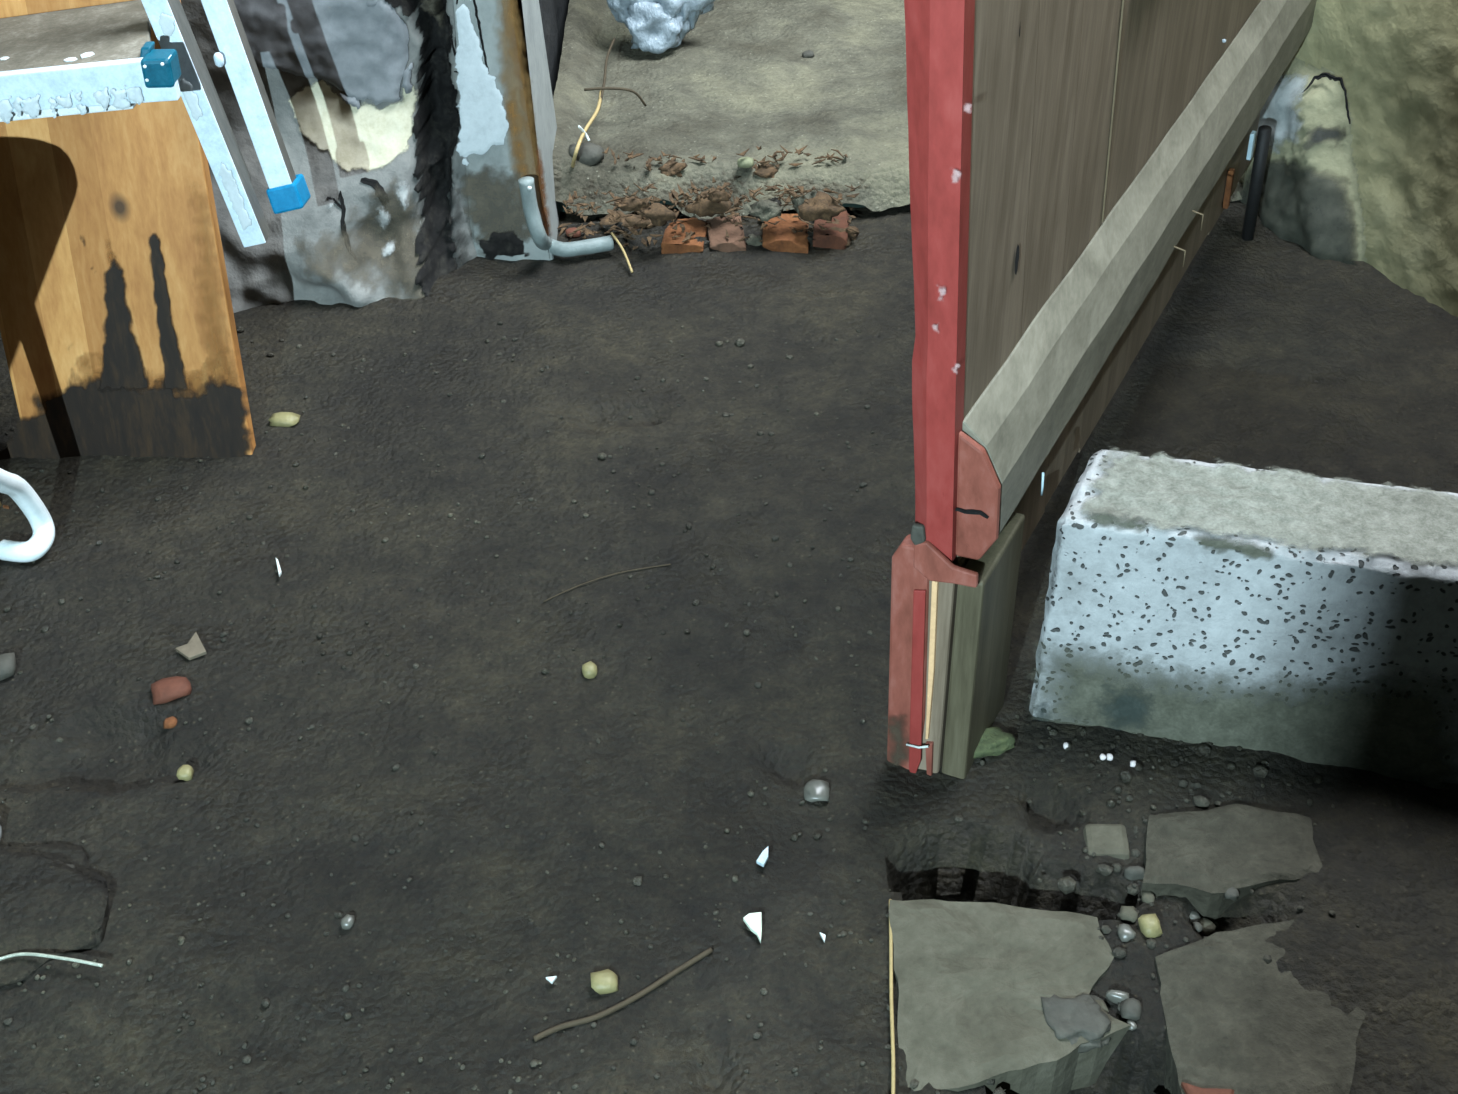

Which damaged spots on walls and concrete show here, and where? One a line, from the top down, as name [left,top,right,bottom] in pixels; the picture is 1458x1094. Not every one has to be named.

peeling [234,0,509,297]
spalling [479,231,528,260]